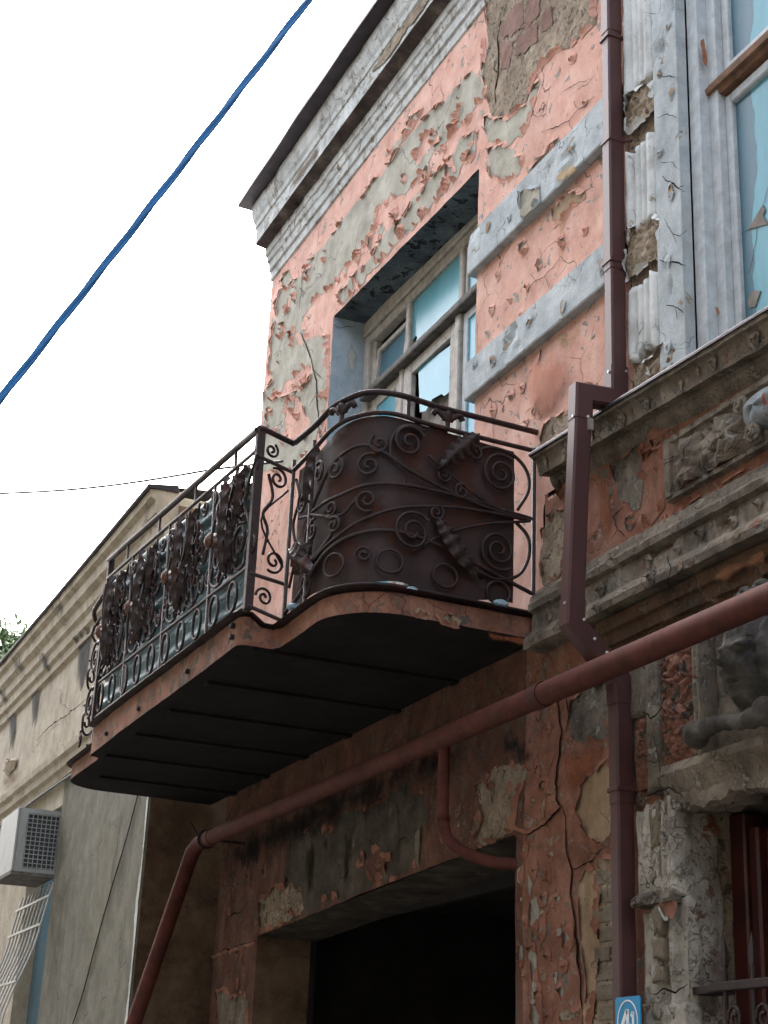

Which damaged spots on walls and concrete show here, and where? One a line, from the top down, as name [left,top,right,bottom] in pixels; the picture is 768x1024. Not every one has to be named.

crack [493,20,515,99]
crack [542,79,595,132]
spalling [623,68,661,135]
peeling [262,0,597,474]
spalling [622,213,670,282]
crack [300,332,322,433]
spalling [608,428,767,531]
spalling [539,480,566,585]
spalling [258,783,427,934]
peeling [473,760,527,848]
crack [513,698,603,1007]
spalling [515,683,613,1024]